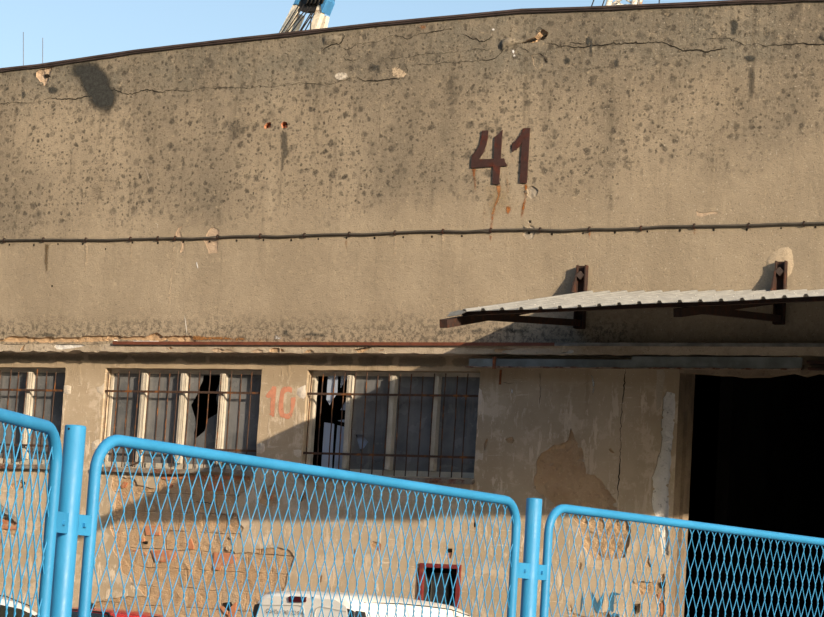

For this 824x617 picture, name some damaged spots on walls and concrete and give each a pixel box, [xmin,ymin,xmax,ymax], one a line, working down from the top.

spalling [36,67,53,86]
leakage [72,63,116,110]
crack [113,28,502,95]
crack [550,27,824,53]
spalling [203,227,219,253]
spalling [0,333,196,351]
crack [617,369,626,499]
spalling [258,485,306,507]
spalling [532,429,631,561]
spalling [94,473,295,617]